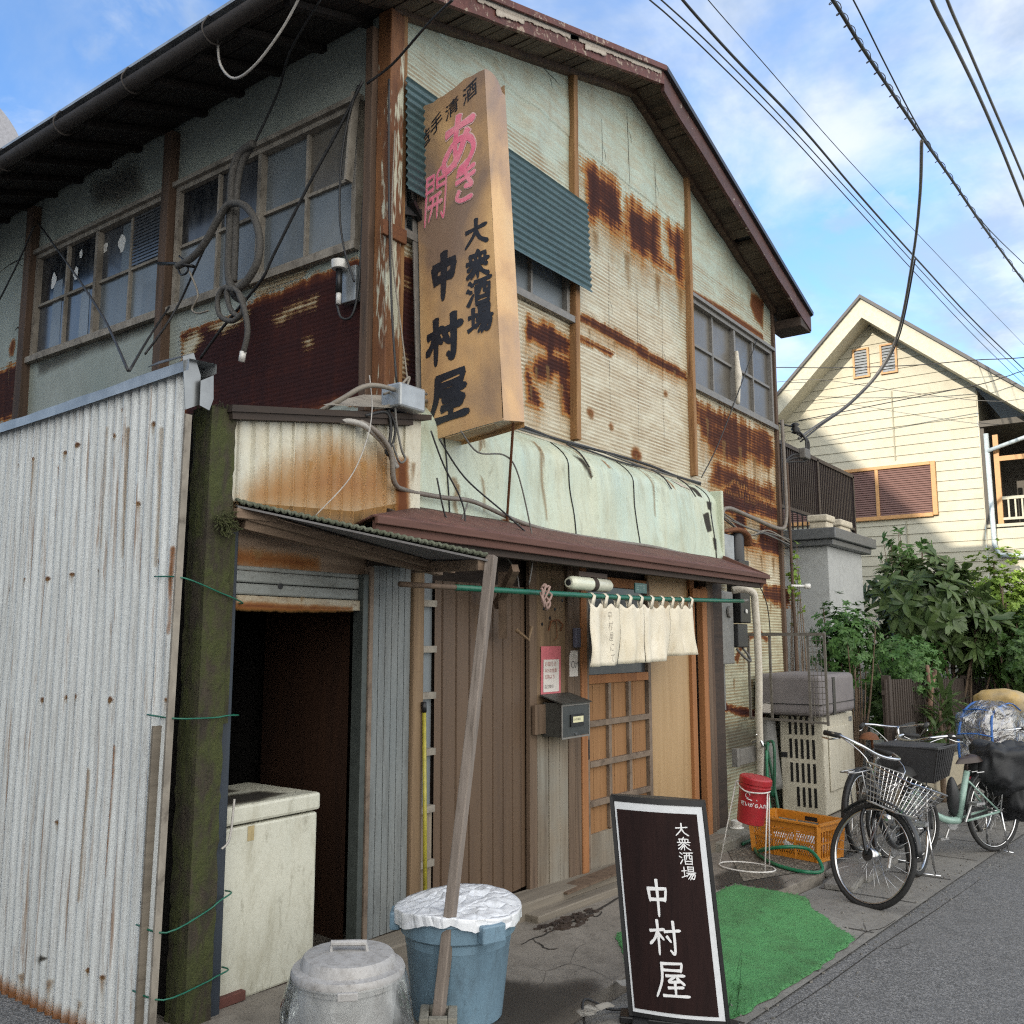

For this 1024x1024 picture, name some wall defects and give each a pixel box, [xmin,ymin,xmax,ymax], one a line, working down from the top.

rust [579,155,764,340]
rust [180,268,360,414]
rust [524,312,687,421]
rust [248,445,415,513]
rust [696,398,779,568]
rust [158,547,175,607]
rust [0,976,78,1024]